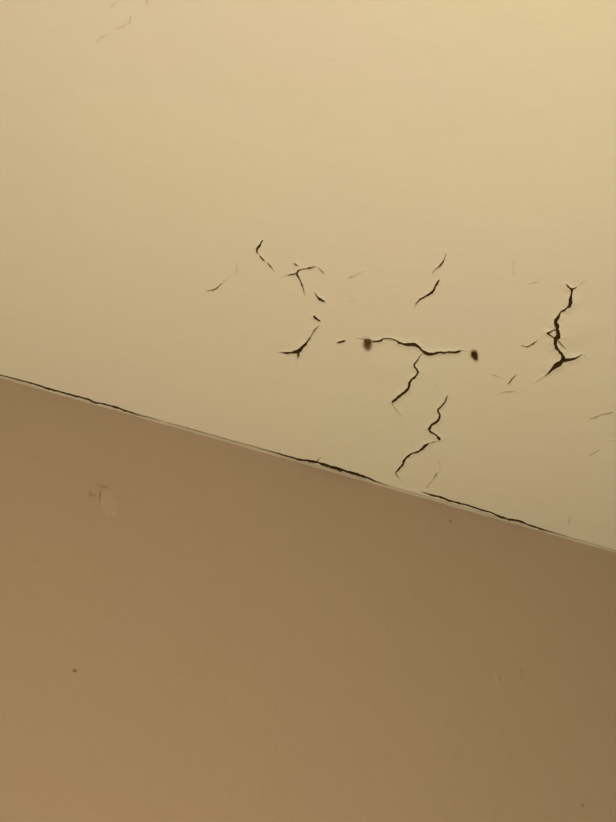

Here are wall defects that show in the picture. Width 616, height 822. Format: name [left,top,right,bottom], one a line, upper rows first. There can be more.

crack [204,275,231,292]
crack [505,278,589,386]
crack [252,238,469,485]
crack [0,375,151,418]
crack [422,492,558,534]